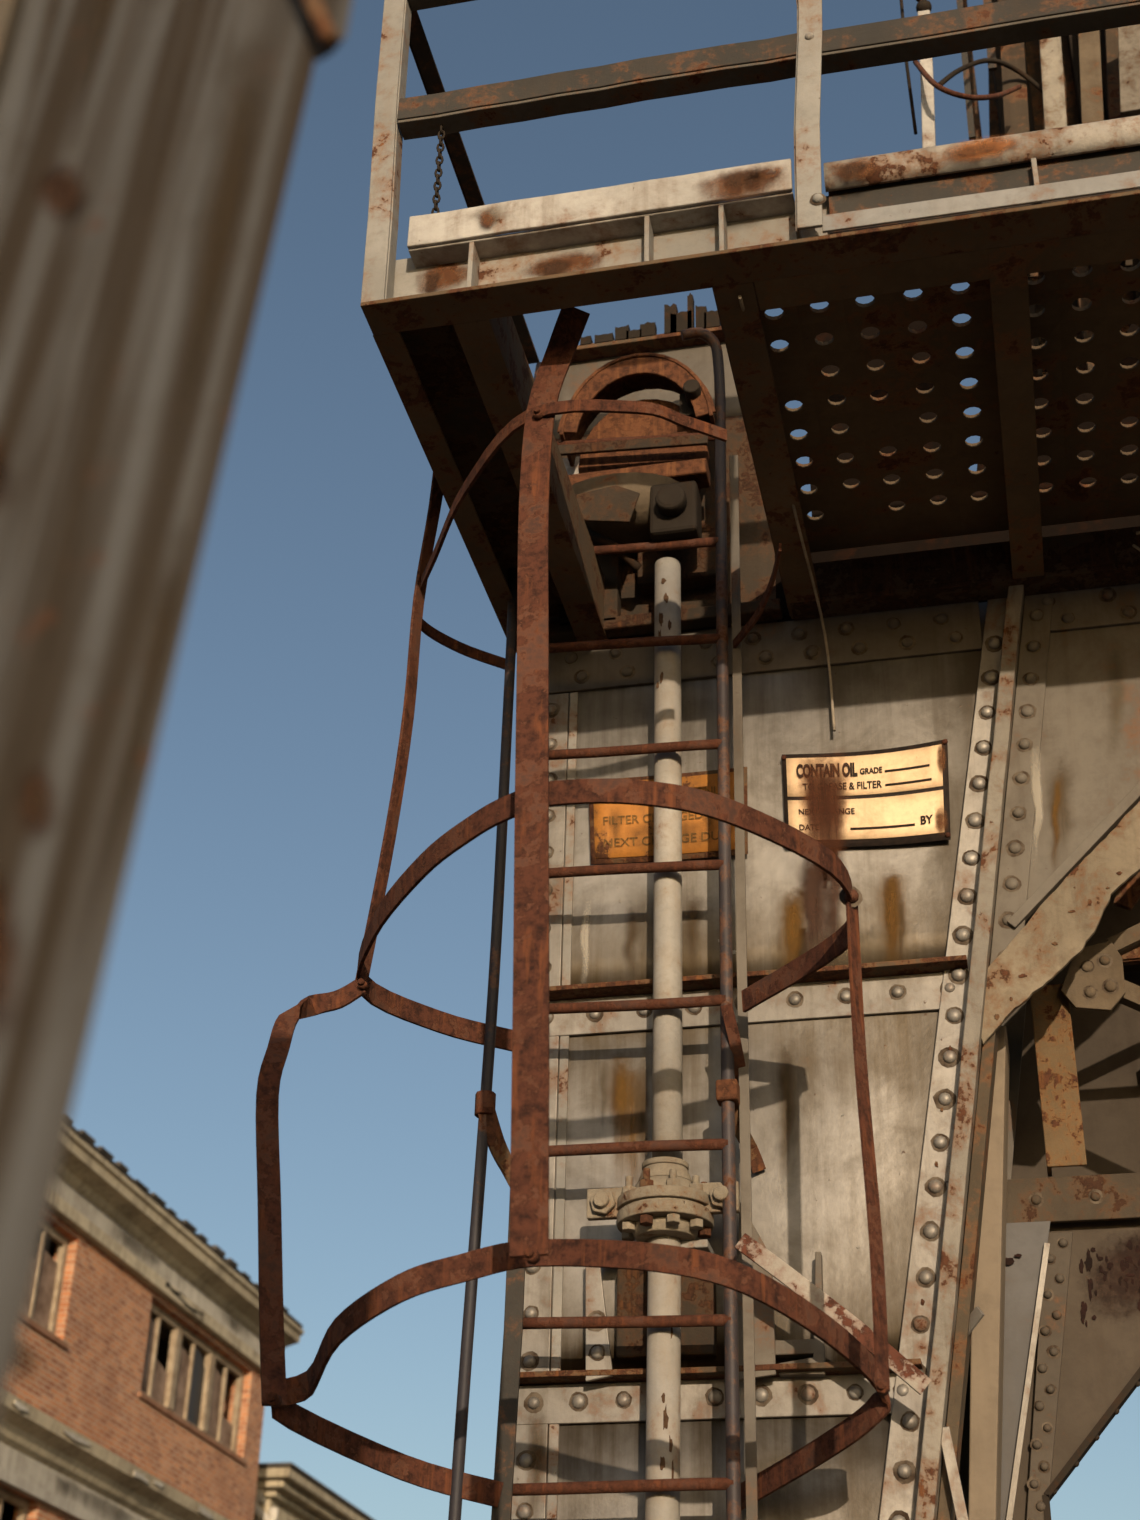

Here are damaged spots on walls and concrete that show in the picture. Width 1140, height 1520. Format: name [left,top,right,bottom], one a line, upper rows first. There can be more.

corrosion [835,160,876,178]
corrosion [952,139,1016,160]
corrosion [784,868,841,957]
corrosion [883,875,903,950]